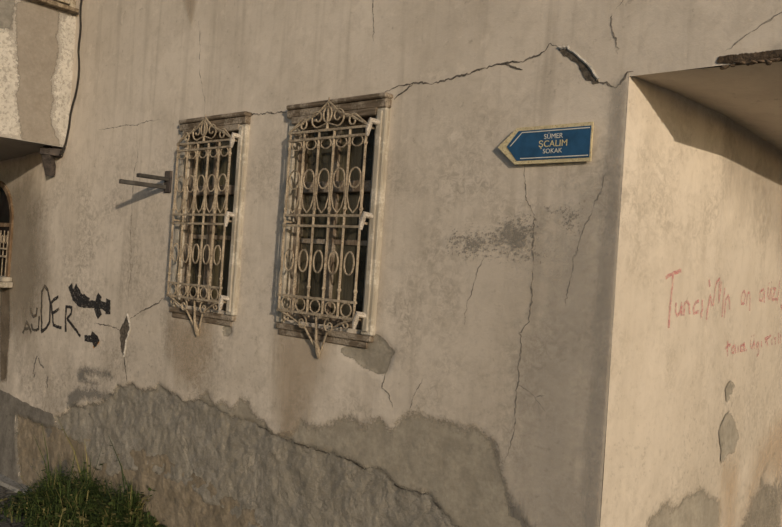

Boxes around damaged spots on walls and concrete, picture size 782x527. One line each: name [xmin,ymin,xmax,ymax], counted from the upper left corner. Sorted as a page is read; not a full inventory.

crack [610,0,623,54]
peeling [0,0,76,146]
crack [385,43,555,100]
crack [599,71,633,88]
spalling [717,49,782,64]
crack [96,300,161,330]
crack [505,167,544,458]
flaking render [341,334,395,374]
flaking render [719,381,739,462]
flaking render [55,383,522,527]
peeling [648,487,722,527]
peeling [740,449,782,527]